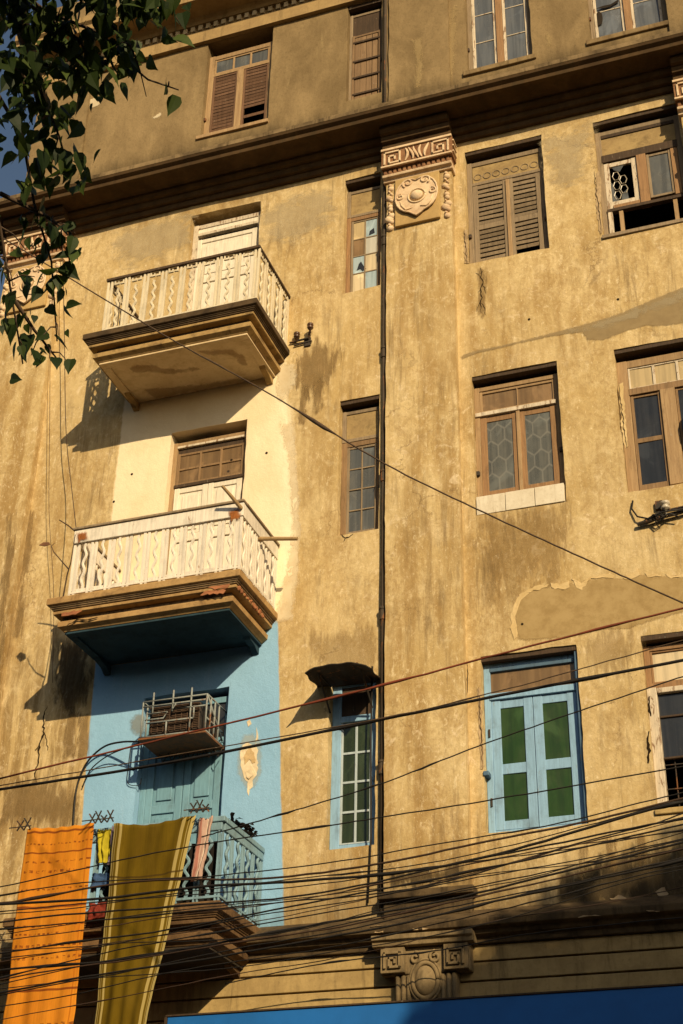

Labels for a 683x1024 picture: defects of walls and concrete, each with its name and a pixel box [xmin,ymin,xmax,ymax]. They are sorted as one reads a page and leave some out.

crack [476,268,486,316]
water stain [296,338,338,424]
flaking render [510,568,683,640]
crack [34,706,48,782]
peeling [240,720,258,796]